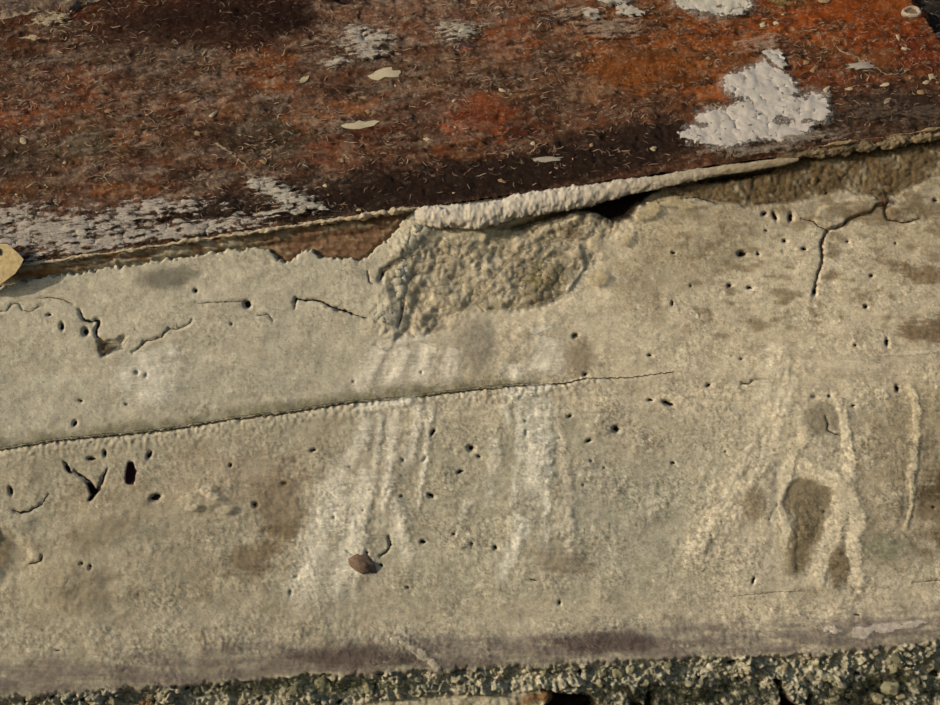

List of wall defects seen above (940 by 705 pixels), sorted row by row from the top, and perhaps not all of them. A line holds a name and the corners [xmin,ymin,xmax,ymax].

crack [804,206,919,289]
crack [0,297,105,356]
crack [134,301,273,351]
crack [294,298,366,318]
water stain [353,324,490,392]
crack [0,371,674,451]
water stain [496,323,590,581]
water stain [678,341,940,588]
water stain [291,397,435,602]
peeling [386,634,444,679]
hole [545,691,588,705]
peeling [697,663,720,676]